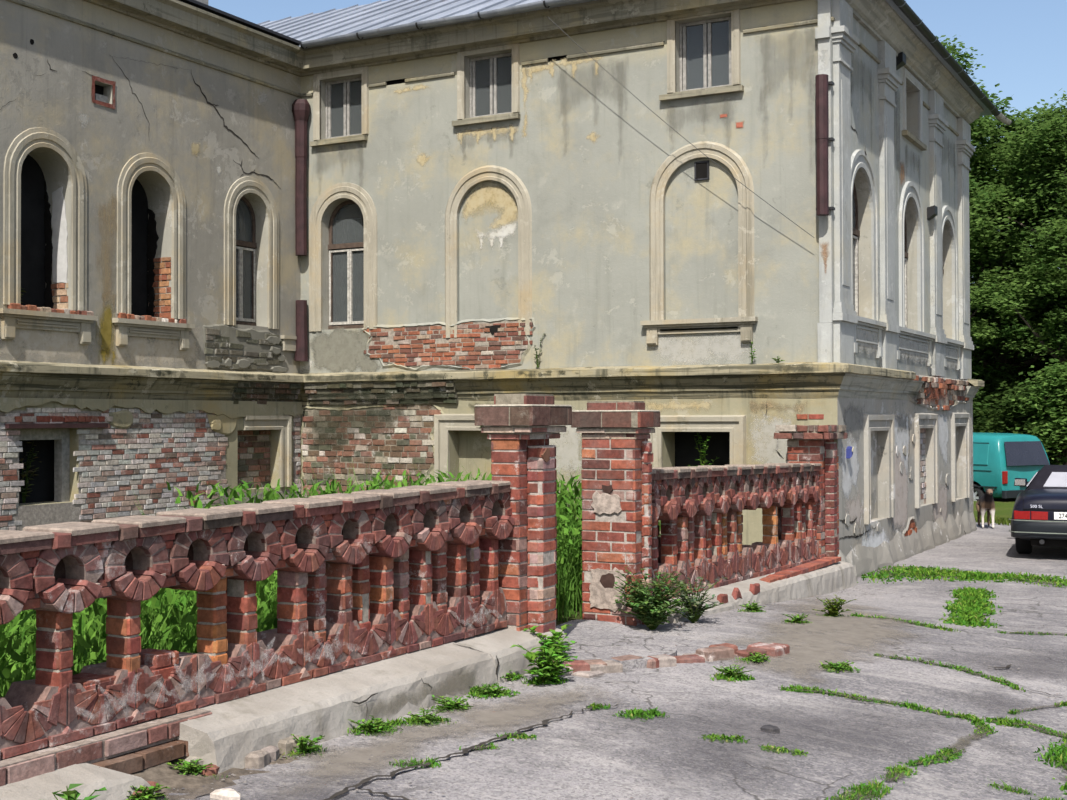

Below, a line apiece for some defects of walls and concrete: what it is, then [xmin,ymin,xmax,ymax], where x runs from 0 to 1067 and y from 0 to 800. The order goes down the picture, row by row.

crack [82,55,281,189]
leakage [99,199,117,362]
peeling [464,187,518,249]
spalling [0,317,536,531]
peeling [841,405,953,548]
spalling [906,349,970,411]